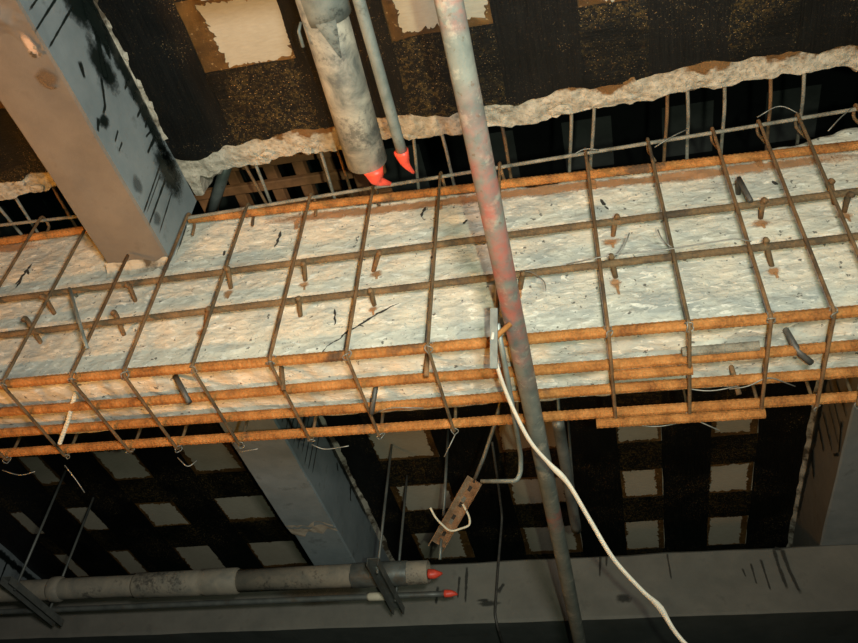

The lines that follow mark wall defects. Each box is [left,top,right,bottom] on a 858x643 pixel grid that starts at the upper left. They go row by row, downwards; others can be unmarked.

spalling [0,172,57,201]
peeling [22,36,42,58]
water stain [36,0,182,231]
peeling [93,0,168,141]
spalling [175,126,342,196]
corrosion [279,195,478,229]
spalling [398,113,463,140]
spalling [484,45,858,128]
corrosion [501,155,843,199]
spalling [105,257,169,278]
peeling [219,419,337,537]
peeling [786,407,817,547]